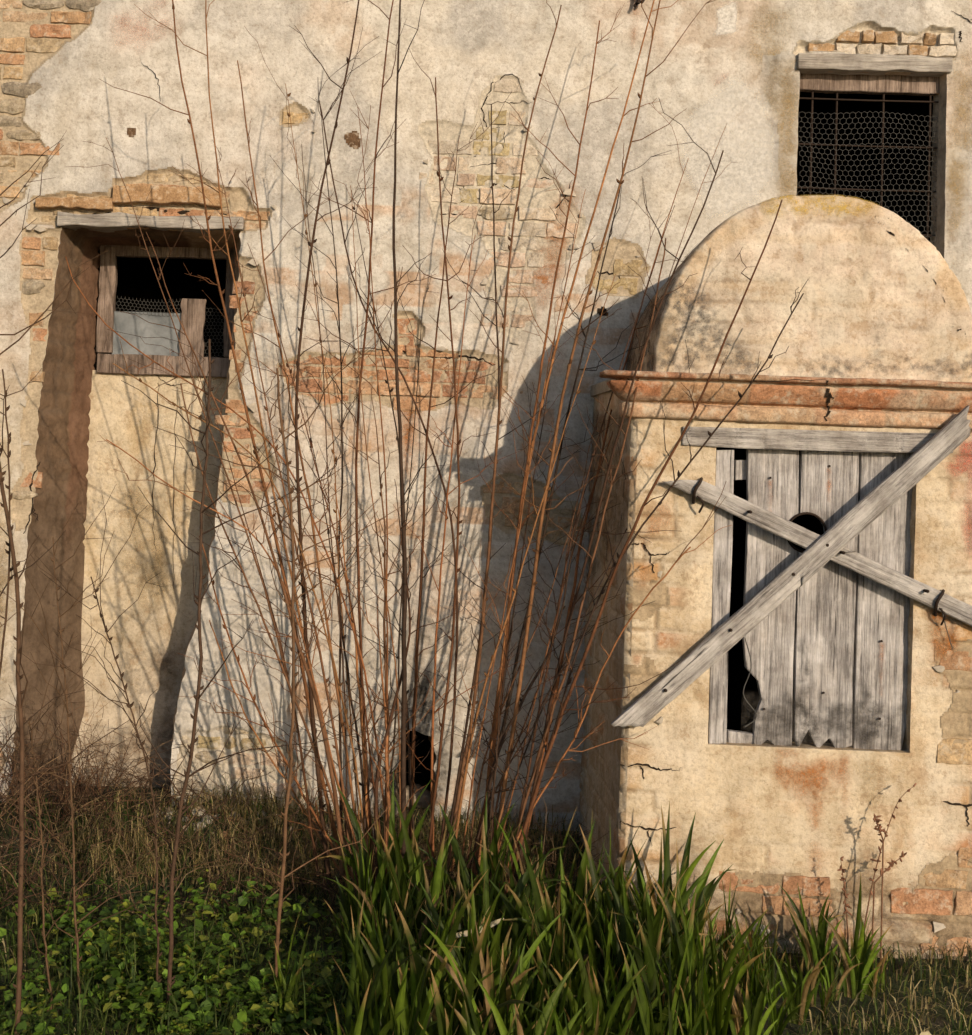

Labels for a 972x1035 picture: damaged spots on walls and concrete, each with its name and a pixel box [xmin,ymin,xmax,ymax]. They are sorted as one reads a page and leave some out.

flaking render [792,21,959,60]
spalling [279,102,317,133]
flaking render [344,131,361,149]
spalling [418,75,651,345]
flaking render [0,0,277,534]
spalling [277,311,523,414]
crack [631,543,670,573]
crack [620,763,681,779]
crack [943,801,972,827]
crack [620,821,676,844]